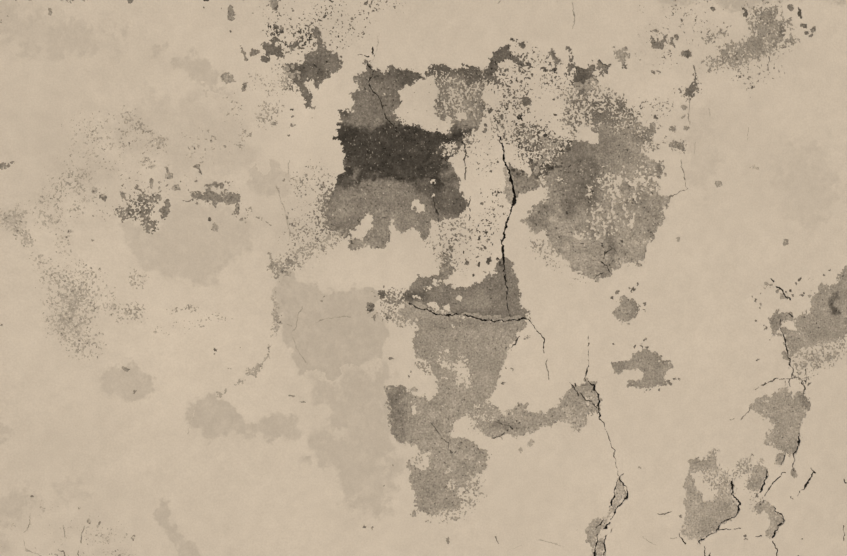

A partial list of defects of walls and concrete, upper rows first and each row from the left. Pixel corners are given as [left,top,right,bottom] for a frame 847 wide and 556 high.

peeling [240,25,343,109]
water stain [332,117,478,218]
peeling [337,38,535,153]
peeling [503,1,816,286]
peeling [216,175,459,398]
crack [408,136,549,379]
peeling [373,252,603,523]
crack [569,343,628,556]
crack [596,242,616,276]
crack [642,433,816,556]
peeling [679,387,811,541]
crack [730,279,807,420]